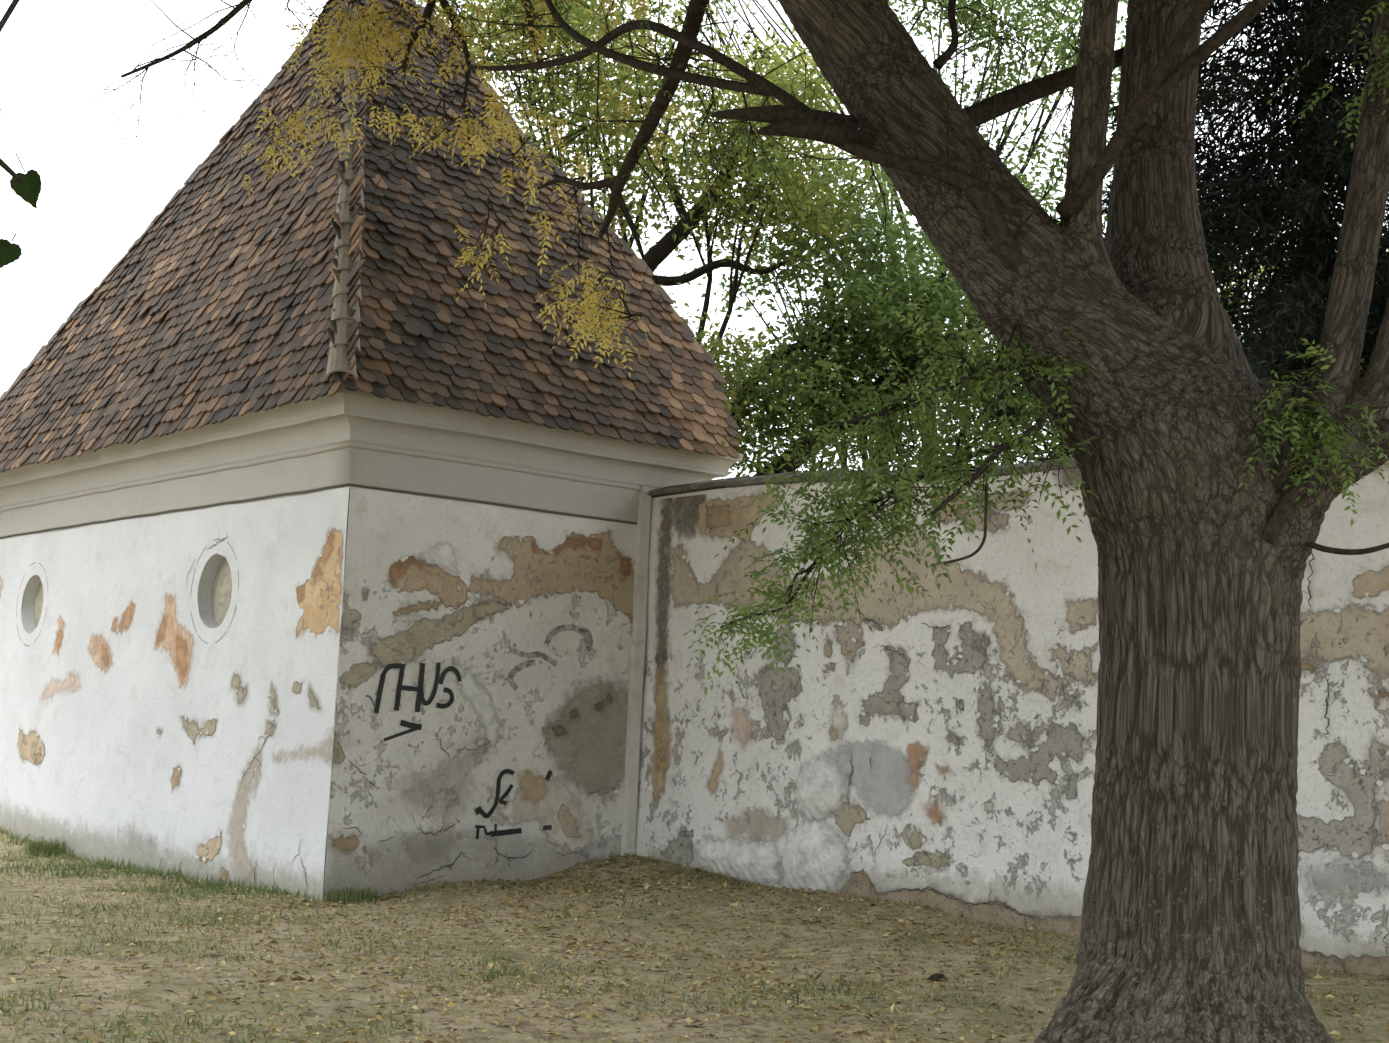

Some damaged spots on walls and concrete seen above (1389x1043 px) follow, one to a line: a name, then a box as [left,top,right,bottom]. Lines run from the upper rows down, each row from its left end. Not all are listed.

peeling [933,485,1028,532]
flaking render [17,728,45,766]
peeling [231,672,249,704]
peeling [196,682,321,881]
flaking render [296,528,368,641]
flaking render [340,531,635,692]
leakage [655,494,705,673]
flaking render [666,830,694,867]
peeling [831,798,871,837]
peeling [668,493,1099,800]
peeling [1297,739,1389,858]
peeling [1300,566,1389,701]